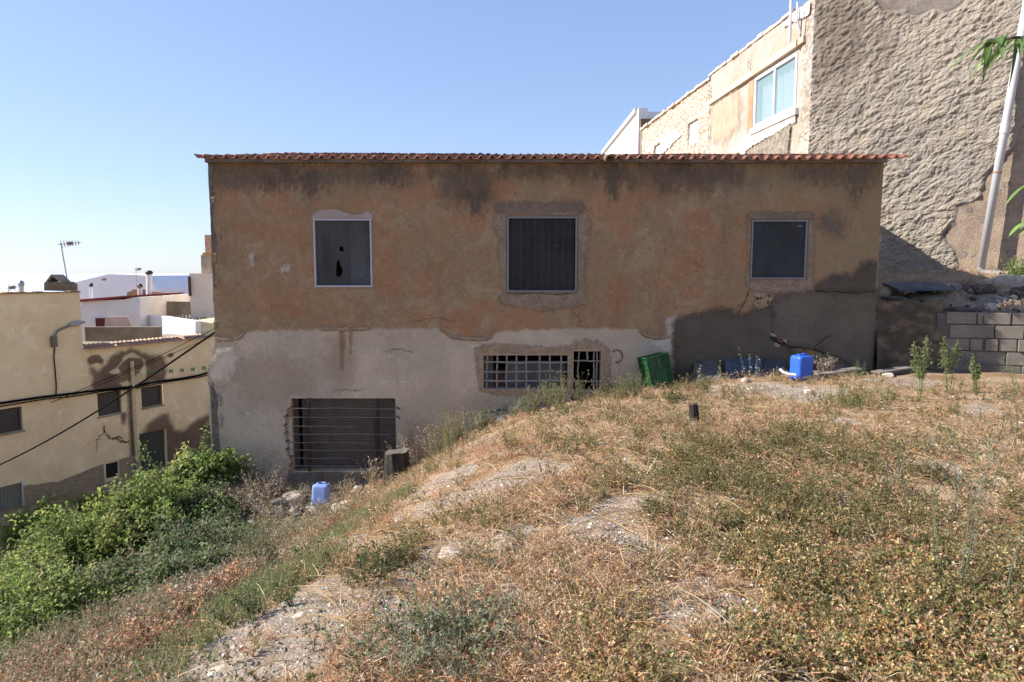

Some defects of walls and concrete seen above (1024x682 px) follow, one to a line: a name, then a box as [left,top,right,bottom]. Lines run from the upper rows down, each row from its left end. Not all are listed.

spalling [944,127,1024,271]
crack [772,335,843,360]
crack [96,426,130,447]